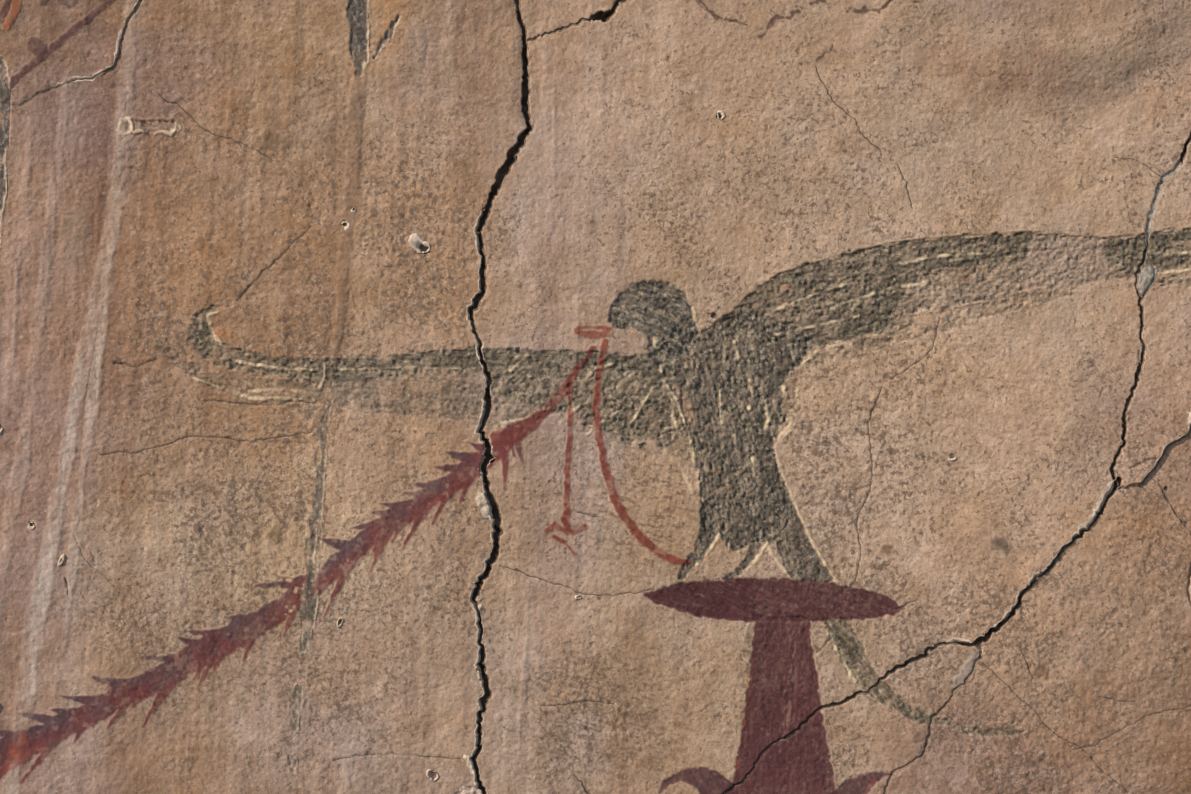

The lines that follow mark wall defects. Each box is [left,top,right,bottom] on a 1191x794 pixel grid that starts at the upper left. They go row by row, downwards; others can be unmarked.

crack [9,0,142,106]
crack [333,0,655,794]
crack [815,66,913,209]
crack [723,135,1191,794]